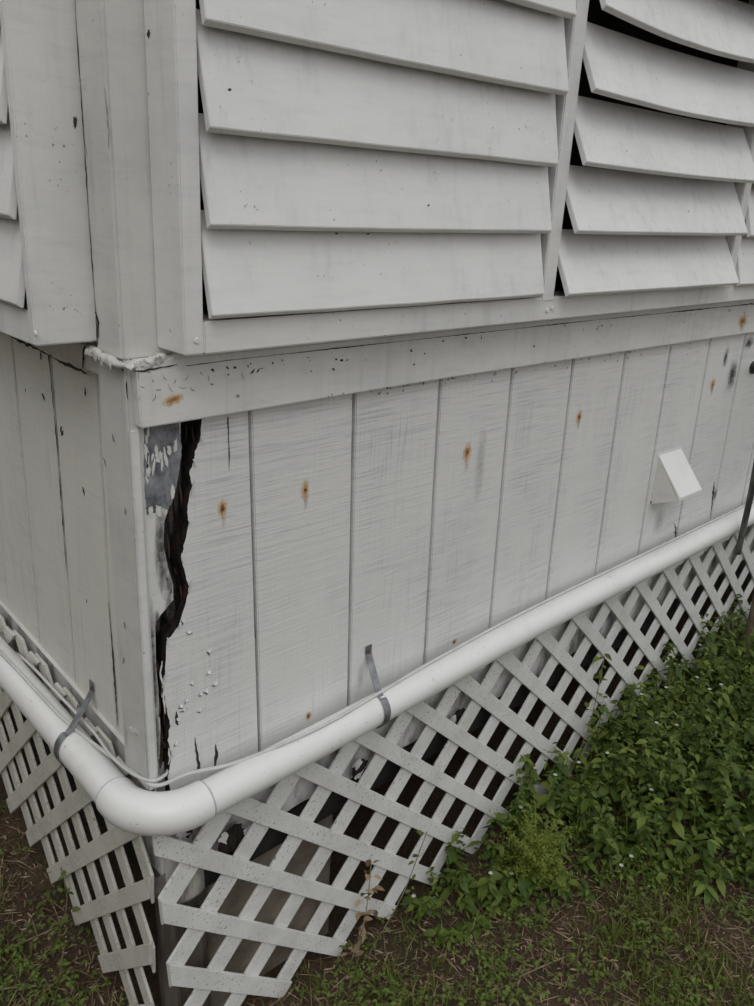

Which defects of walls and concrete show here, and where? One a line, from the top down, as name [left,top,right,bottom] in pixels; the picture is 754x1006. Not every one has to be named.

crack [3,8,110,374]
peeling [144,422,197,518]
crack [195,739,218,769]